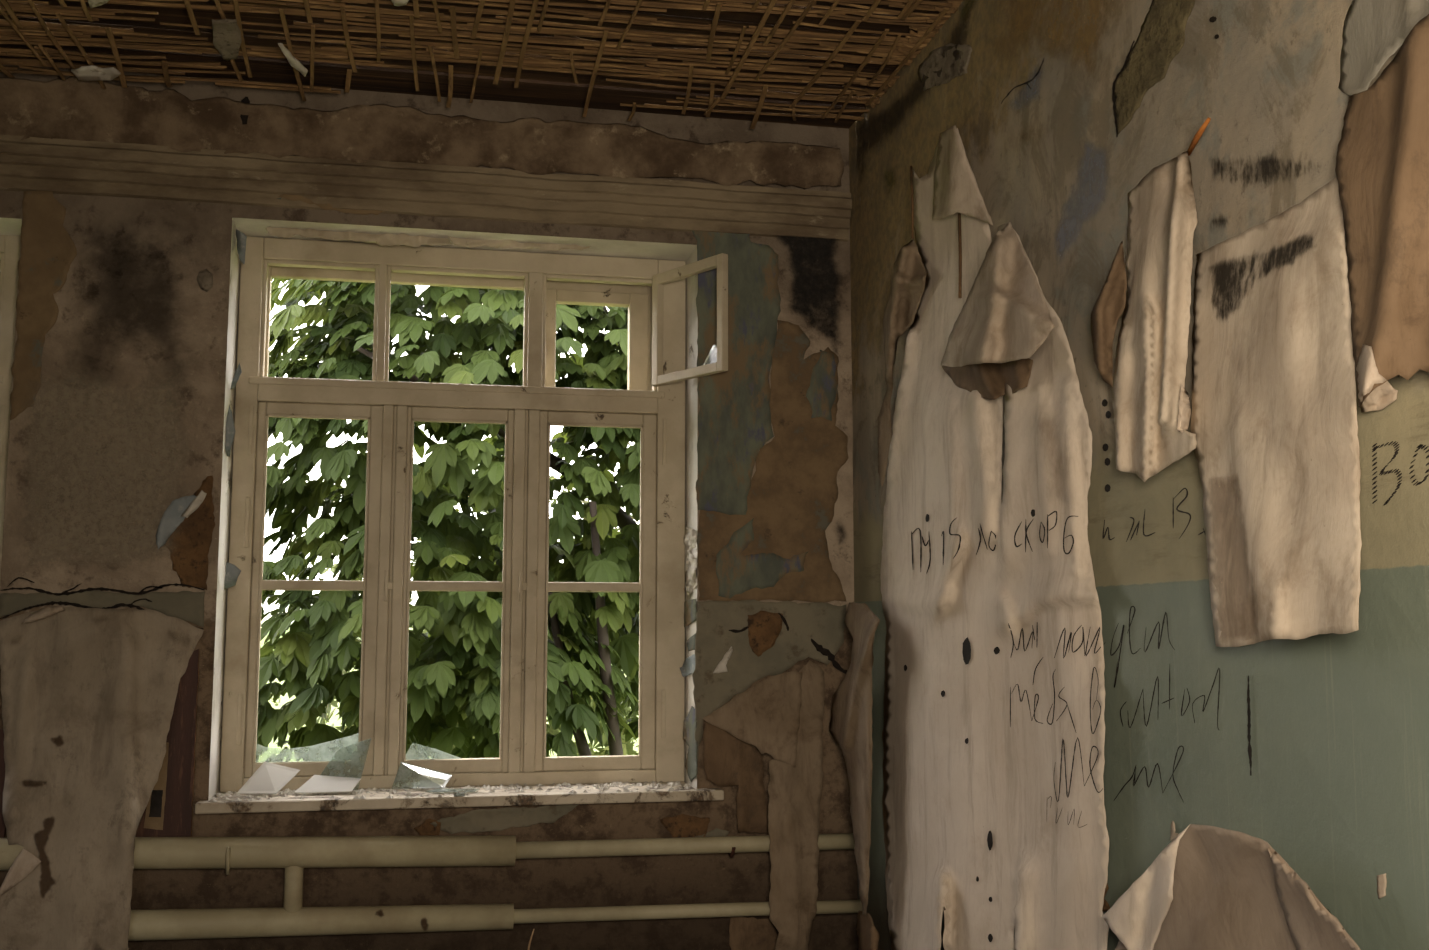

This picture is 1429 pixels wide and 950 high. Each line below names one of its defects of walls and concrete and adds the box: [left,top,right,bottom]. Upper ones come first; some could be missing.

flaking render [1114,0,1195,136]
peeling [680,230,849,782]
flaking render [660,814,729,838]
peeling [1377,873,1387,899]